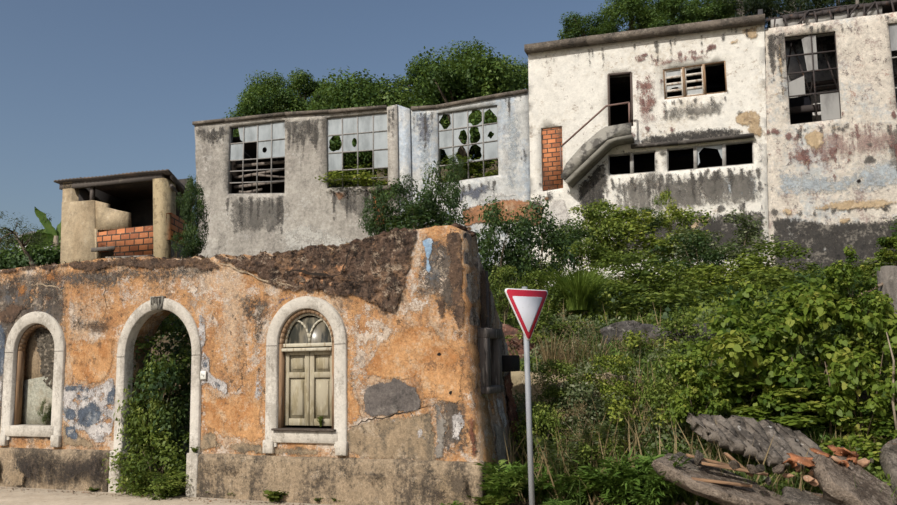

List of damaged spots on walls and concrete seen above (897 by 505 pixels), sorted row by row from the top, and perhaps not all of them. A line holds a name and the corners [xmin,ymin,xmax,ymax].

leakage [663,91,728,120]
spalling [736,111,764,161]
leakage [226,196,284,234]
leakage [331,189,373,220]
leakage [532,121,897,272]
spalling [0,115,570,459]
crack [347,404,435,429]
peeling [9,469,24,487]
leakage [14,454,102,484]